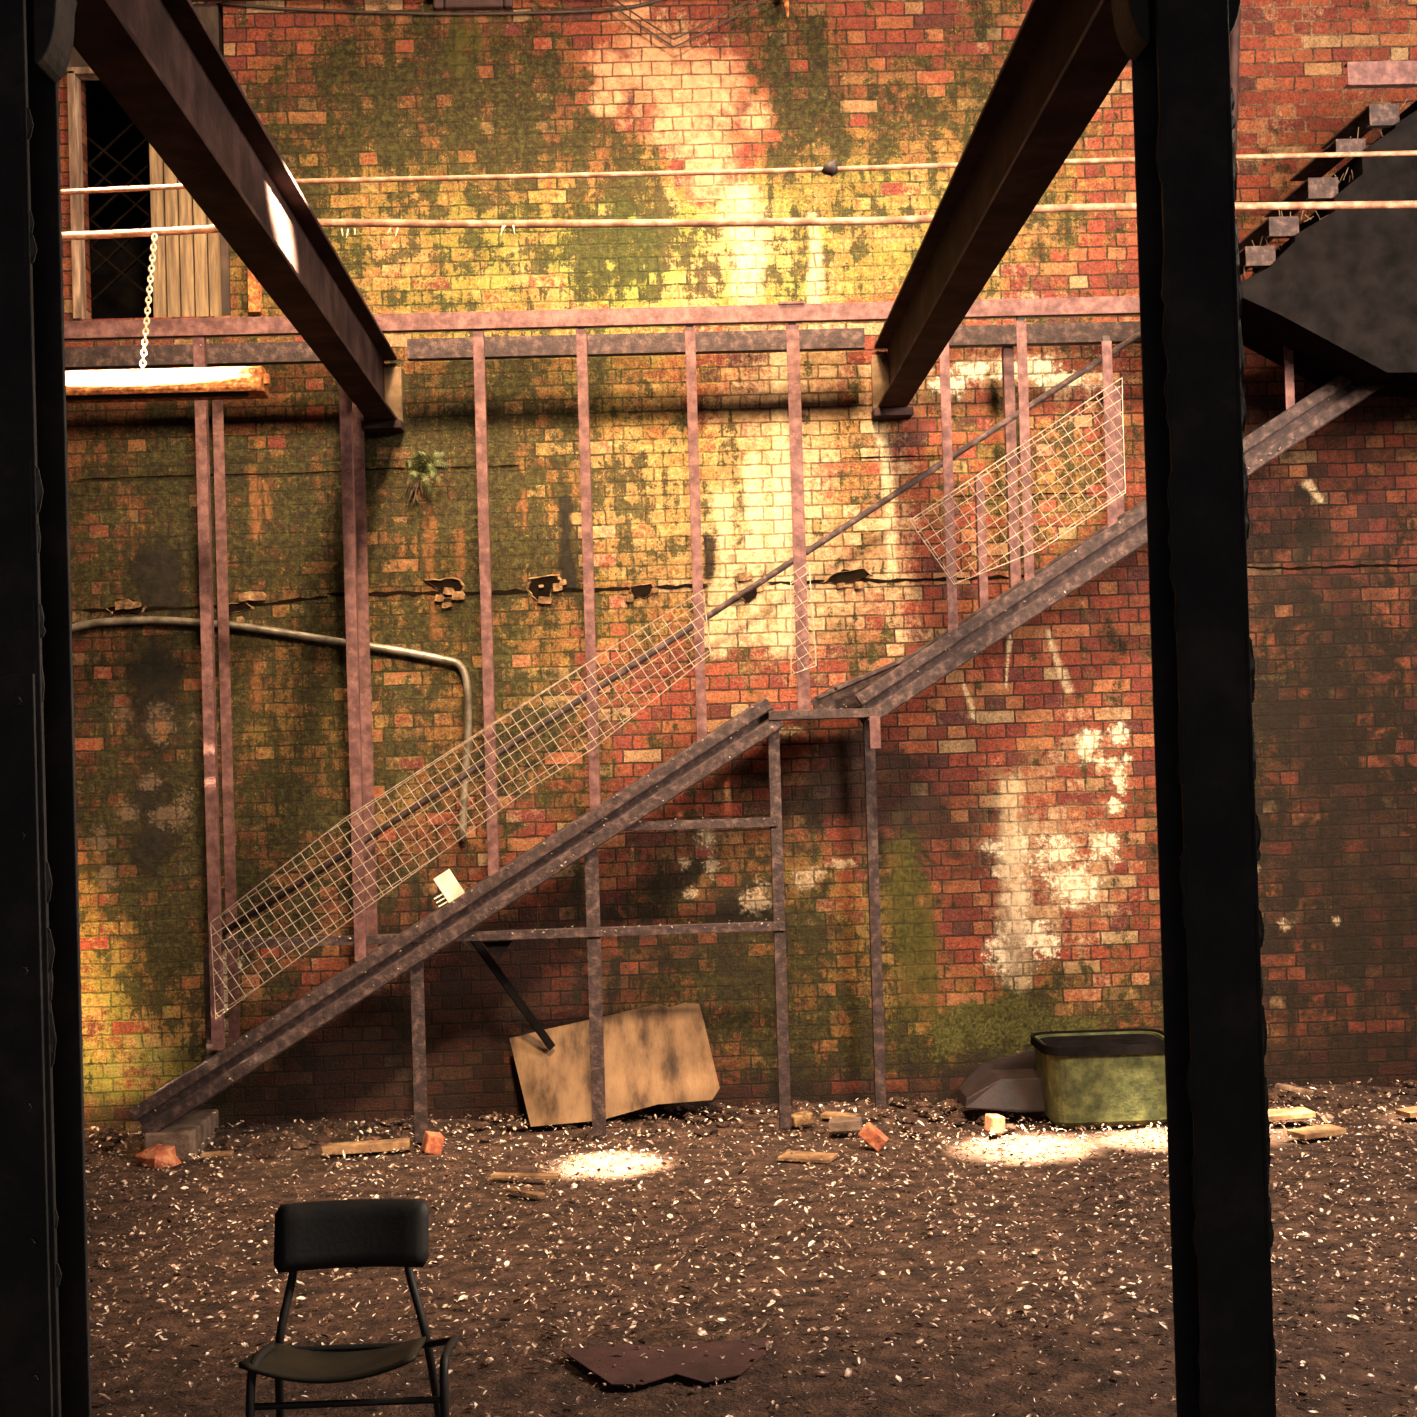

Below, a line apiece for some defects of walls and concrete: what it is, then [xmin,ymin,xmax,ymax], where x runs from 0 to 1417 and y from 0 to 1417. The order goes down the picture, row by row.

spalling [424,577,466,609]
spalling [526,574,567,604]
crack [81,565,1024,620]
spalling [625,583,659,602]
spalling [822,568,873,589]
efflorescence [1076,722,1131,814]
efflorescence [981,825,1120,981]